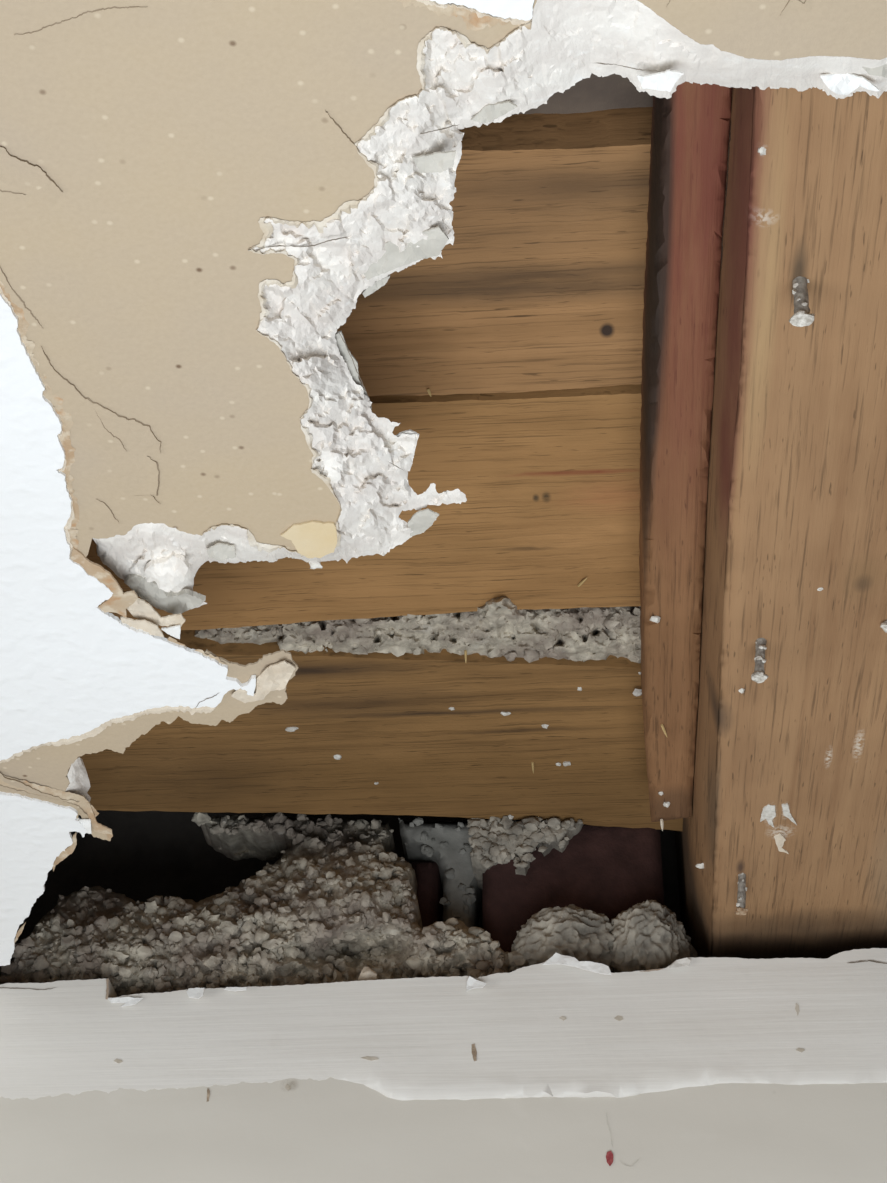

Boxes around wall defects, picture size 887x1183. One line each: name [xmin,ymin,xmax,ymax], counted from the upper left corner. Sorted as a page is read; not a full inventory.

peeling [0,0,887,614]
spalling [0,649,470,944]
spalling [660,829,681,922]
flaking render [542,953,611,975]
flaking render [640,958,691,972]
flaking render [108,997,143,1007]
flaking render [186,988,205,999]
flaking render [466,976,486,991]